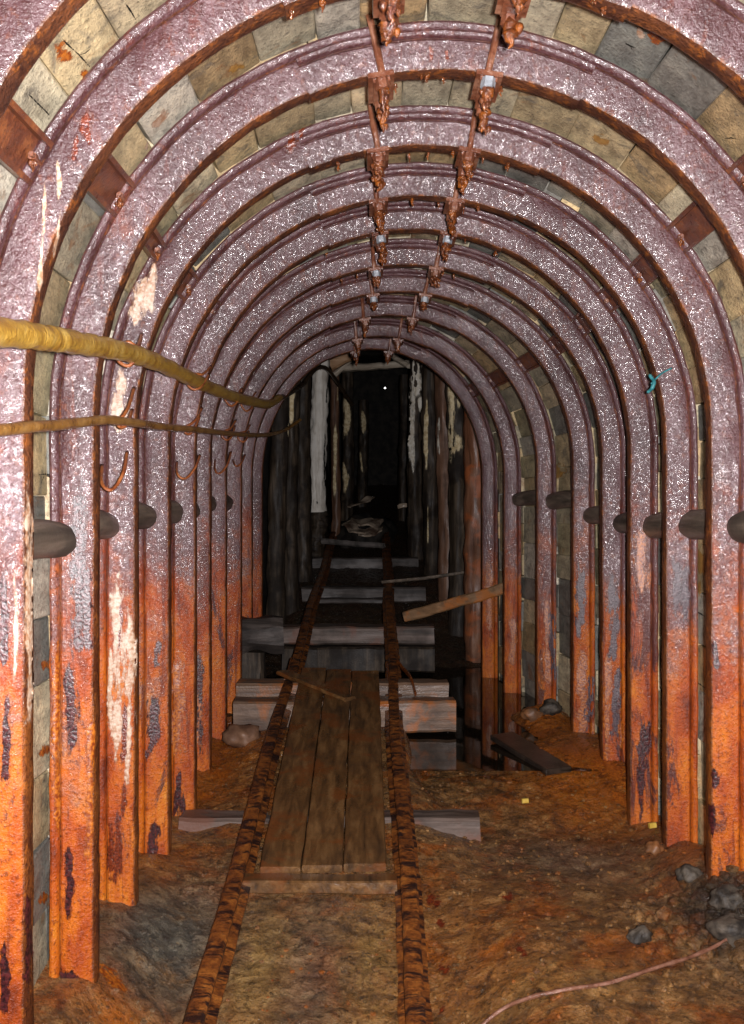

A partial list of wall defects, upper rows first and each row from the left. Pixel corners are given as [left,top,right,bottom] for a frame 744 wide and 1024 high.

rust [377,0,402,46]
rust [431,149,484,288]
rust [632,531,651,593]
rust [0,570,9,667]
rust [0,697,11,781]
rust [39,477,95,920]
rust [120,704,128,761]
rust [145,651,205,762]
rust [575,563,652,818]
rust [107,784,127,885]
rust [147,822,161,854]
rust [0,892,48,1013]